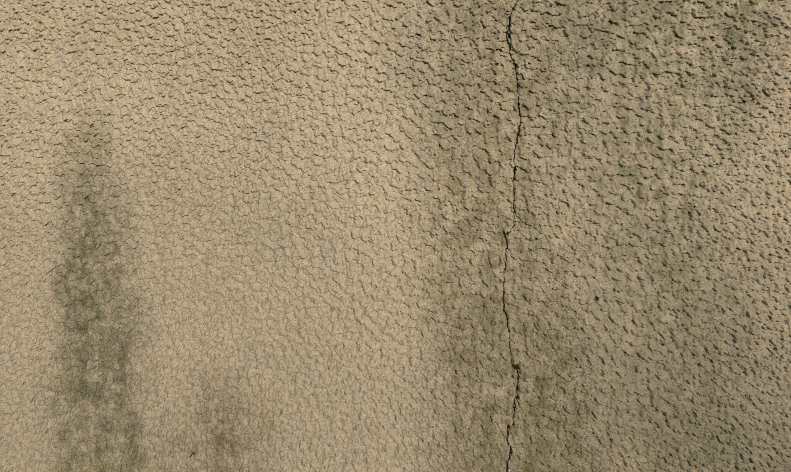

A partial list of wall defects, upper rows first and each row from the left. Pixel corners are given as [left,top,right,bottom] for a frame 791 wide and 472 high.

crack [502,1,522,472]